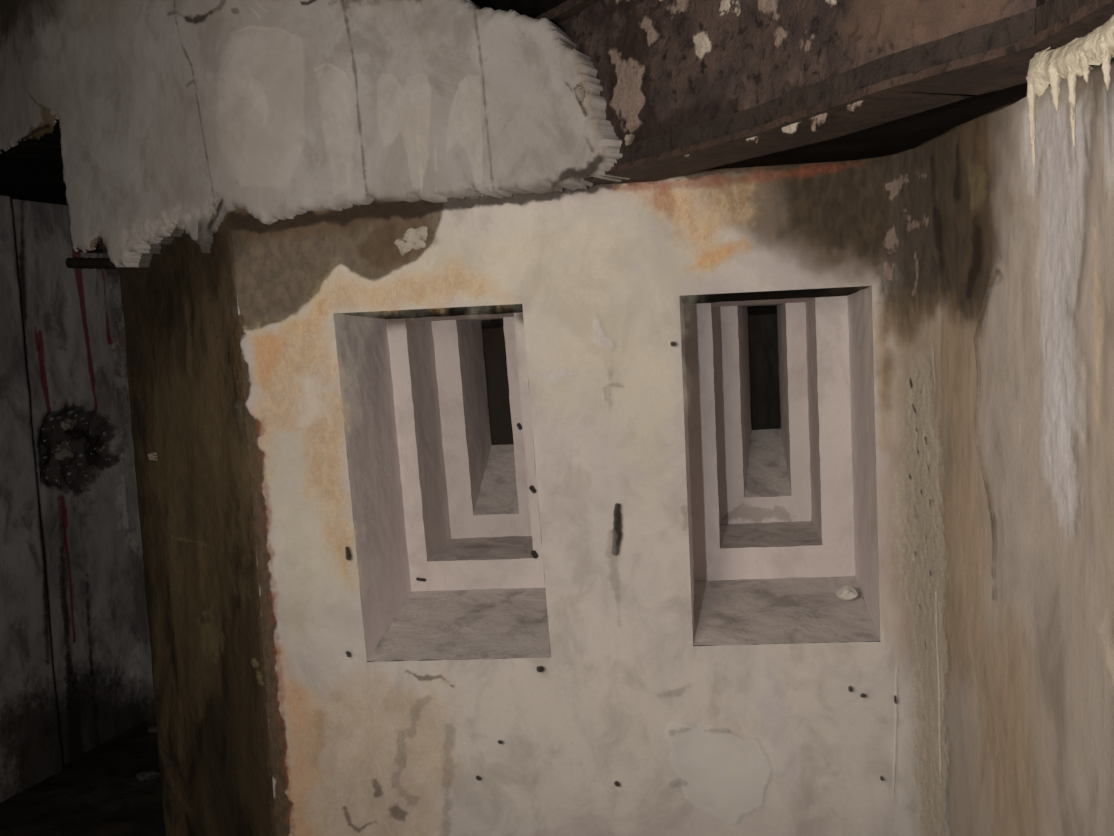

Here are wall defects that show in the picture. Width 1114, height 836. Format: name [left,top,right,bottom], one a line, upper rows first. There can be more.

spalling [185,11,211,23]
rust [605,9,660,147]
spalling [65,236,117,269]
damp [967,217,983,299]
damp [1025,15,1114,524]
spalling [38,284,158,557]
crack [973,270,997,600]